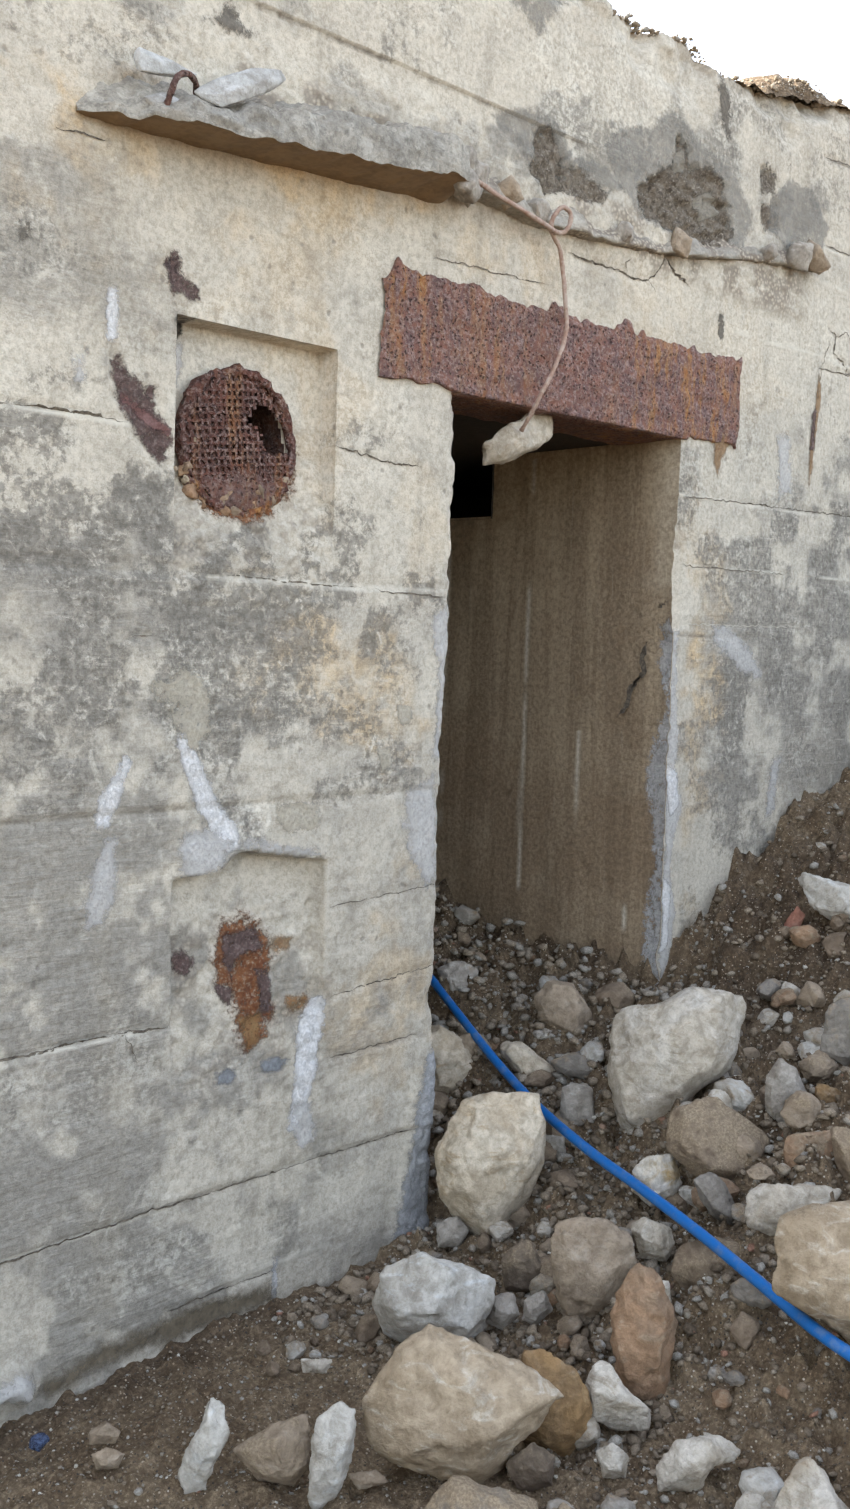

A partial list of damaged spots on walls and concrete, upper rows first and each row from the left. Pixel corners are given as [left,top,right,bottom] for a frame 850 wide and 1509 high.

spalling [530,124,609,204]
spalling [636,141,734,248]
rust [164,249,200,301]
rust [110,354,299,525]
rust [171,909,308,1054]